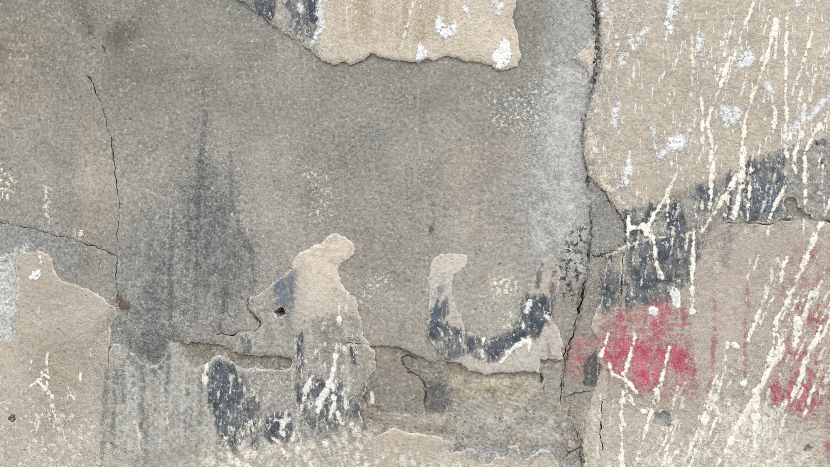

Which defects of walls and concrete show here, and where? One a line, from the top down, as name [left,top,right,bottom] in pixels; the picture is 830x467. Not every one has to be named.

crack [0,222,118,274]
peeling [0,0,626,467]
crack [540,0,627,466]
crack [216,298,261,336]
crack [401,354,427,408]